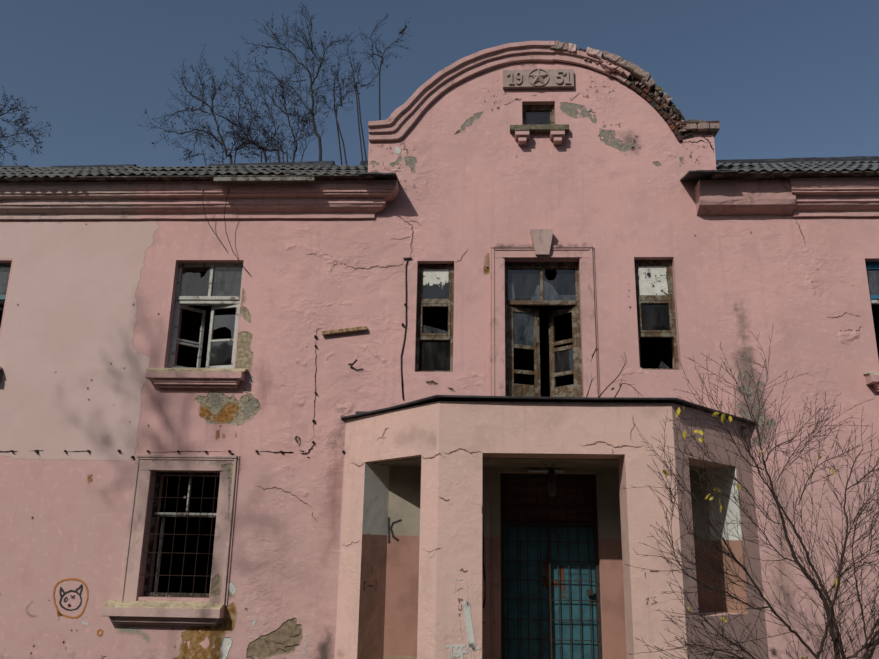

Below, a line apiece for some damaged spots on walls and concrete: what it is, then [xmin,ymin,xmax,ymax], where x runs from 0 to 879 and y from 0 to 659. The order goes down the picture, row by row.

peeling [454,91,521,135]
flaking render [560,62,719,163]
crack [311,215,419,272]
flaking render [195,289,261,439]
damp [736,352,776,446]
crack [423,448,480,459]
crack [256,485,318,522]
flaking render [172,581,247,659]
flaking render [246,617,302,659]